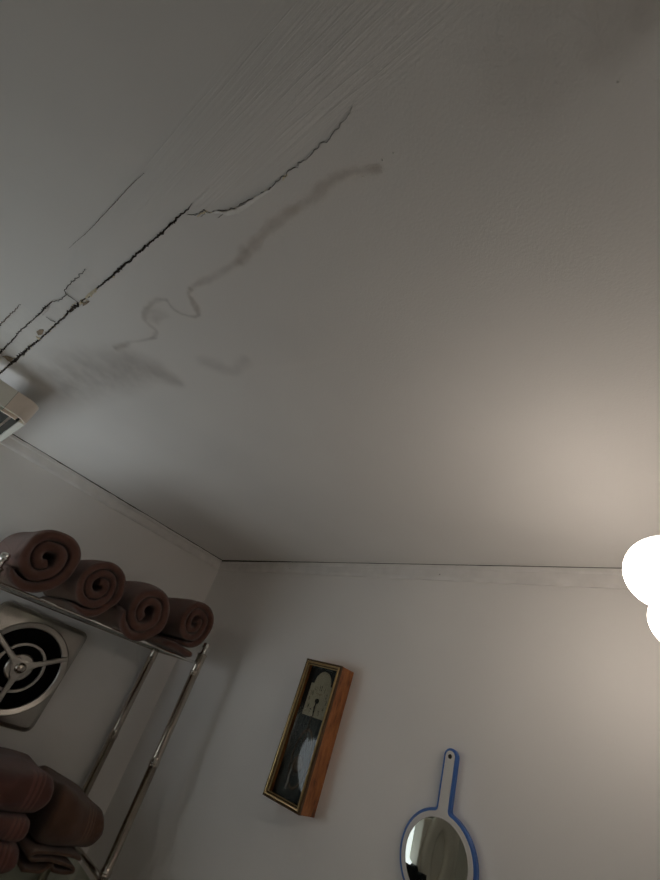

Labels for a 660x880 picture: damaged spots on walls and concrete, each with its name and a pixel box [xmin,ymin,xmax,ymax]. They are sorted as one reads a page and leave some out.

crack [0,189,211,379]
crack [78,173,144,240]